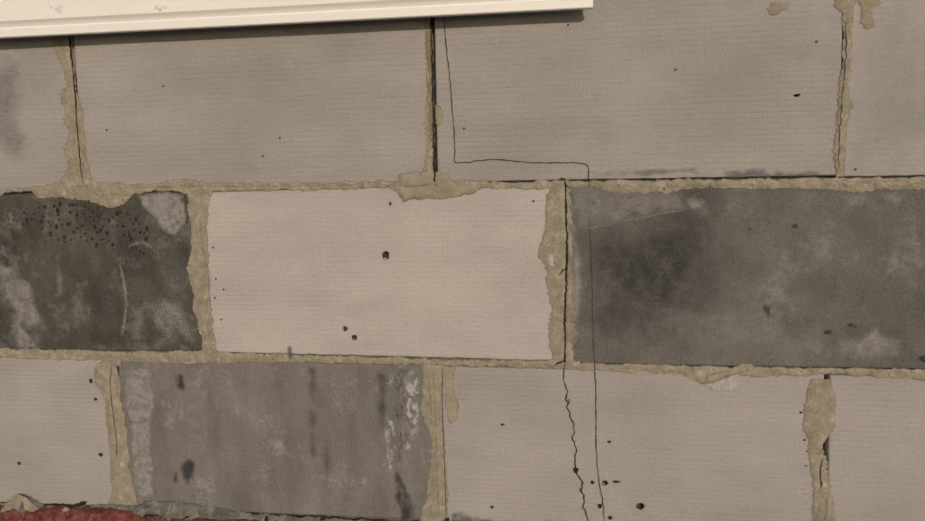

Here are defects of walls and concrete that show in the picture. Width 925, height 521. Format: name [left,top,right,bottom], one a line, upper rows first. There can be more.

crack [69,35,82,177]
crack [838,21,848,166]
crack [443,17,605,521]
leakage [394,370,420,518]